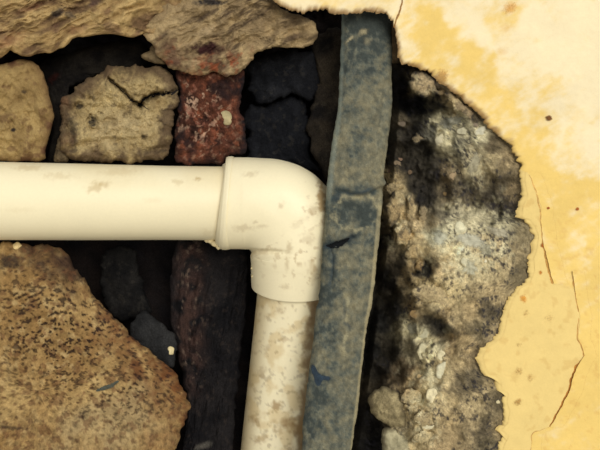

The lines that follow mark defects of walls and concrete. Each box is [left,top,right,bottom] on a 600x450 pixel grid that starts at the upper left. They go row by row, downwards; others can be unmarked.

crack [109,81,179,109]
spalling [221,110,232,125]
flaking render [352,21,598,450]
crack [529,175,554,284]
crack [530,272,584,450]